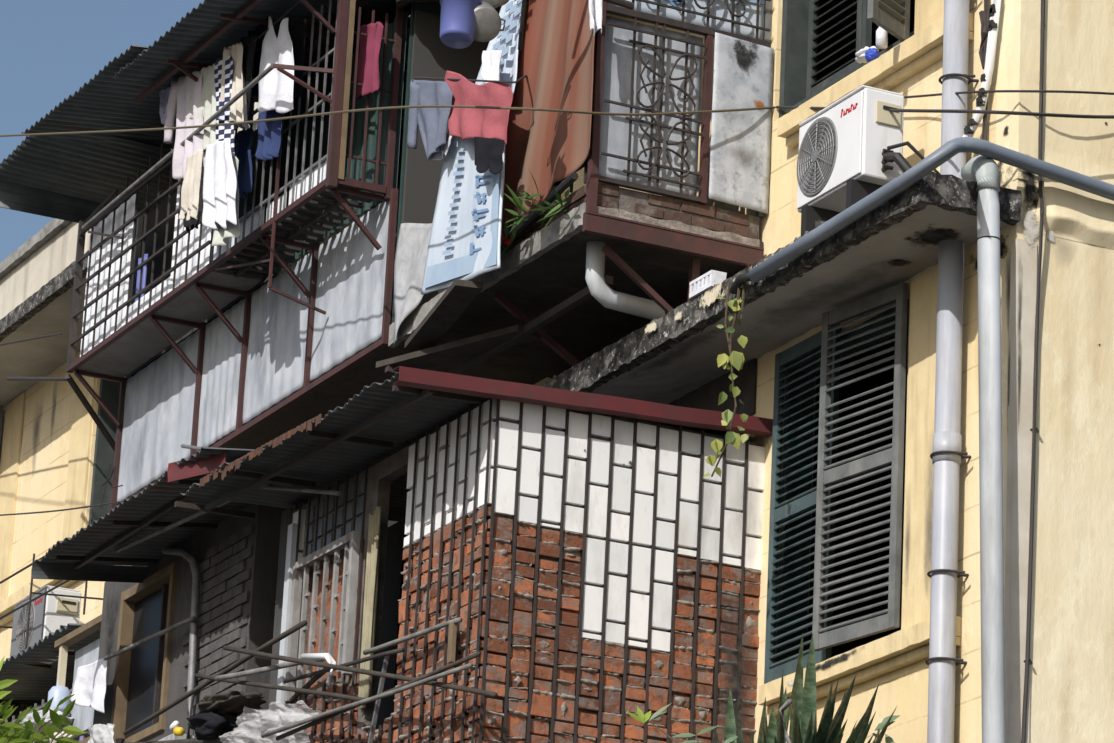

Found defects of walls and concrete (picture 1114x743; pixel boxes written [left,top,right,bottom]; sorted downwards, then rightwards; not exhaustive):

damp [1022,171,1044,209]
damp [904,224,959,246]
damp [1007,272,1021,332]
damp [1008,359,1021,405]